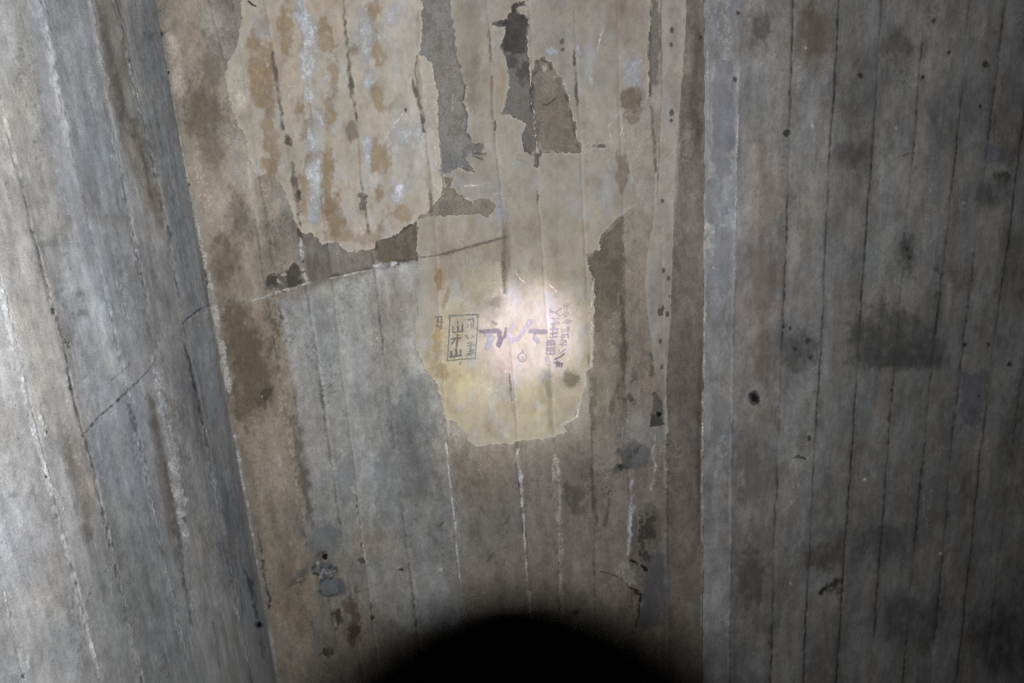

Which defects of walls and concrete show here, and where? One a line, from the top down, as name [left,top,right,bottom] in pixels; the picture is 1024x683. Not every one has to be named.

peeling [419,0,495,218]
peeling [492,2,579,168]
crack [40,265,156,437]
crack [184,304,213,458]
crack [240,240,493,304]
peeling [375,222,418,267]
peeling [588,225,623,332]